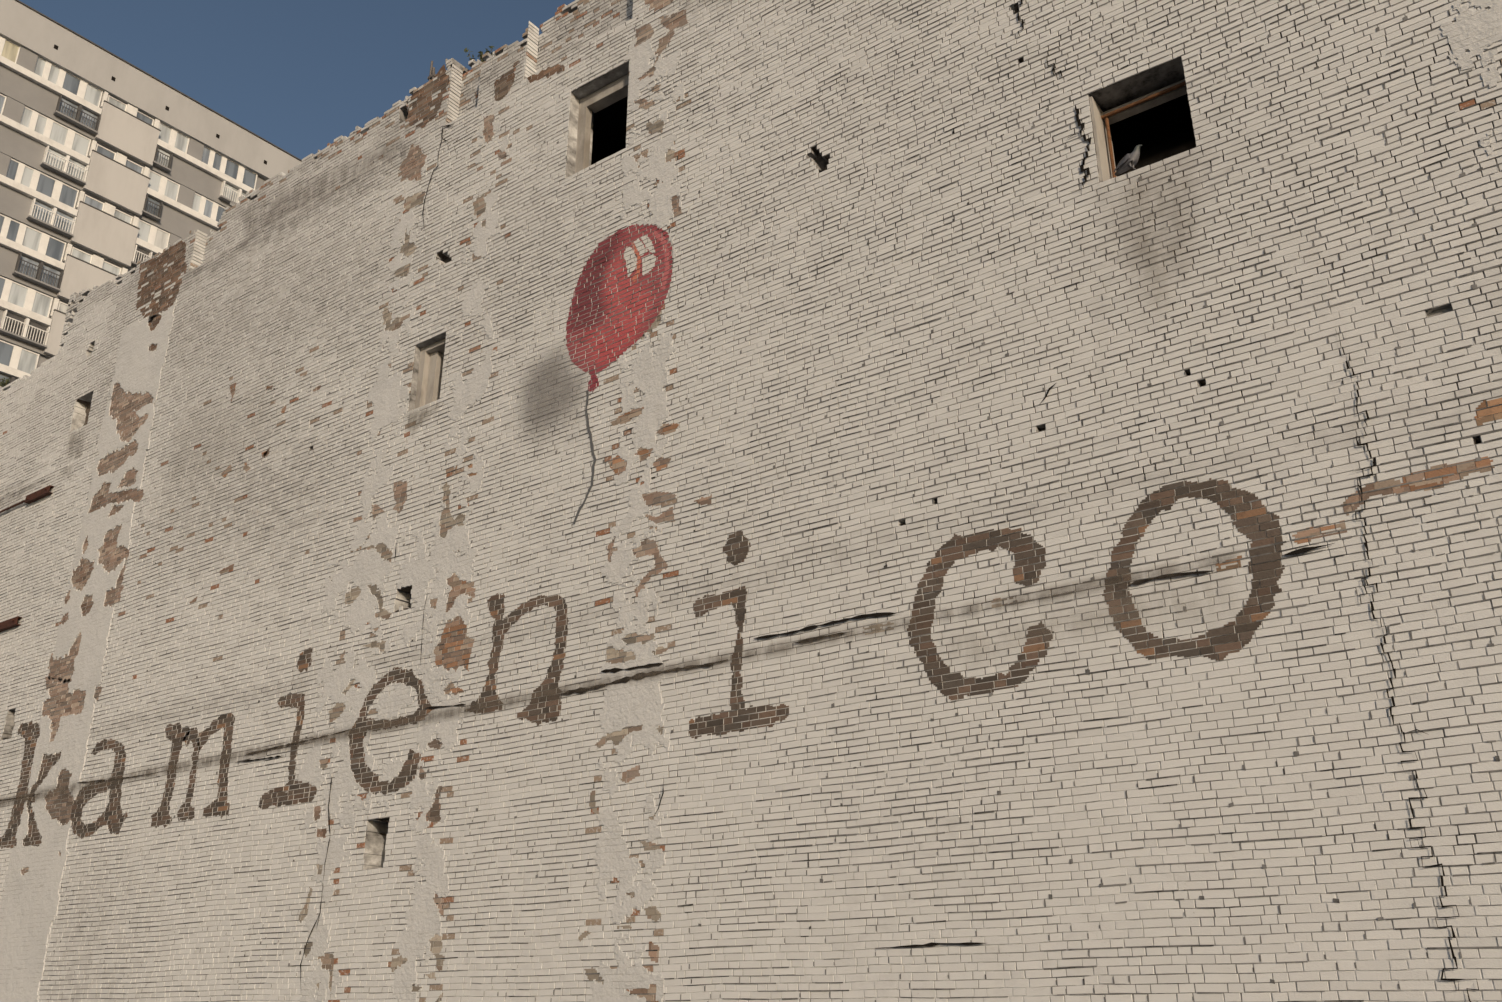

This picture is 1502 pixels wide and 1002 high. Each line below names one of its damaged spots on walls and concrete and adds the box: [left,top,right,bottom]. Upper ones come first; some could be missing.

crack [1015,0,1024,37]
flaking render [399,65,450,211]
crack [1047,61,1091,192]
flaking render [136,240,187,351]
peeling [42,383,154,742]
peeling [345,584,412,651]
peeling [371,481,407,519]
peeling [439,478,466,538]
peeling [430,573,476,695]
crack [1331,329,1479,1002]
peeling [419,766,442,825]
peeling [304,942,334,992]